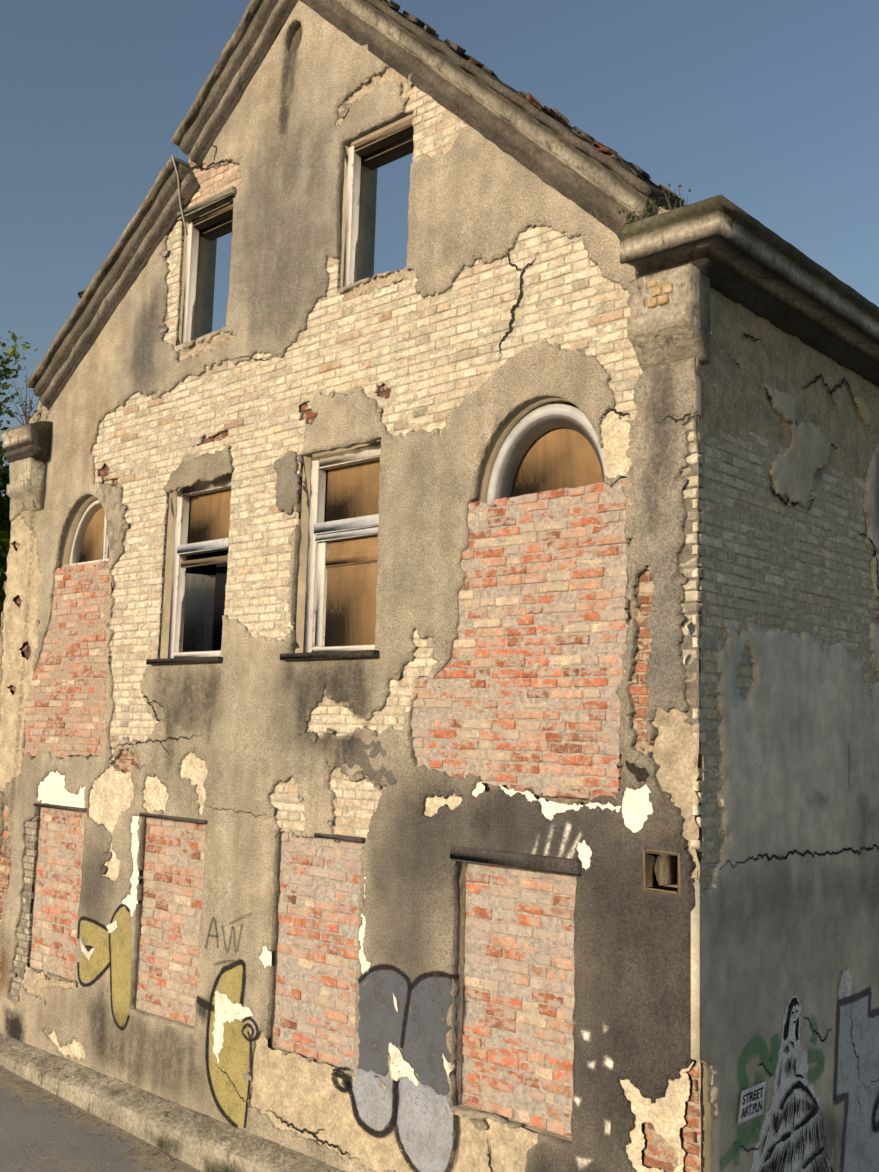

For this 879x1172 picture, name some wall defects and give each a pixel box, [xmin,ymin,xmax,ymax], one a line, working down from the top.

leakage [280,49,296,131]
crack [497,251,539,363]
spalling [647,279,673,308]
spalling [0,221,643,1005]
spalling [499,287,879,894]
crack [859,512,879,601]
crack [712,844,879,869]
flaking render [620,1060,705,1172]